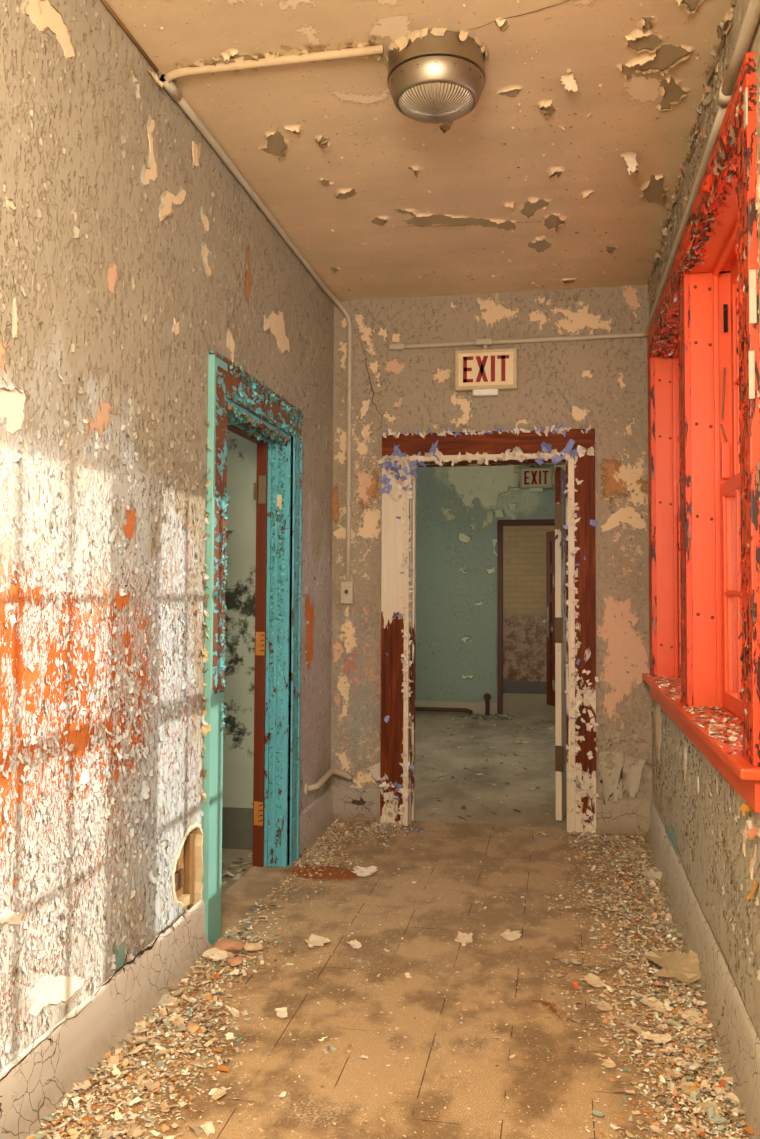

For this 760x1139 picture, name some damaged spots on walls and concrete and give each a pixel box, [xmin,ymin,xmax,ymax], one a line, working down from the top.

peeling [167,0,483,178]
peeling [319,0,760,762]
peeling [355,392,649,834]
peeling [651,699,760,1021]
crack [0,903,188,1119]
peeling [200,1122,215,1136]
peeling [594,1000,613,1011]
peeling [639,997,704,1025]
peeling [672,1057,700,1095]
peeling [719,1077,740,1106]